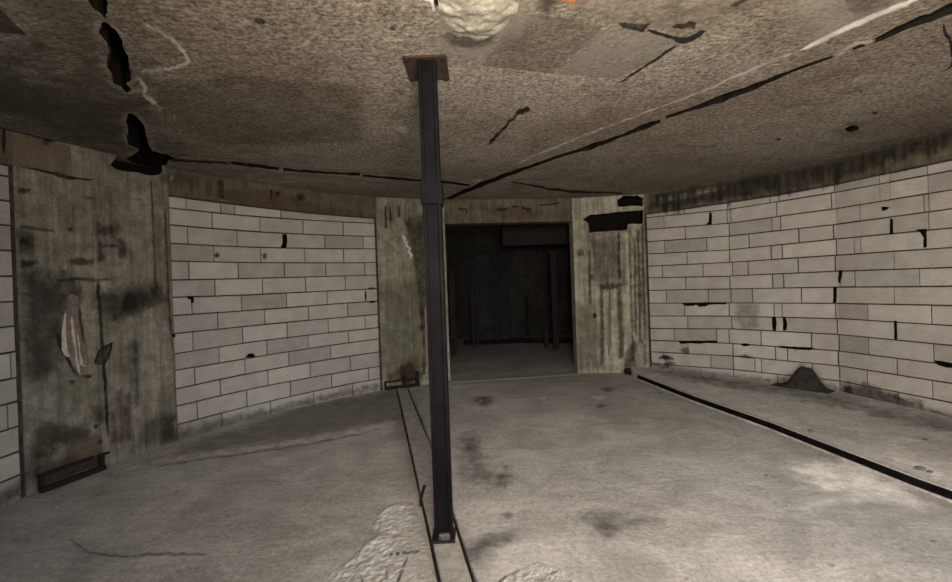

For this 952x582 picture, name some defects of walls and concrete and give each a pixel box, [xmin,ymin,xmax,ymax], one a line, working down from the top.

crack [171,3,952,200]
leakage [518,0,917,164]
peeling [57,294,113,377]